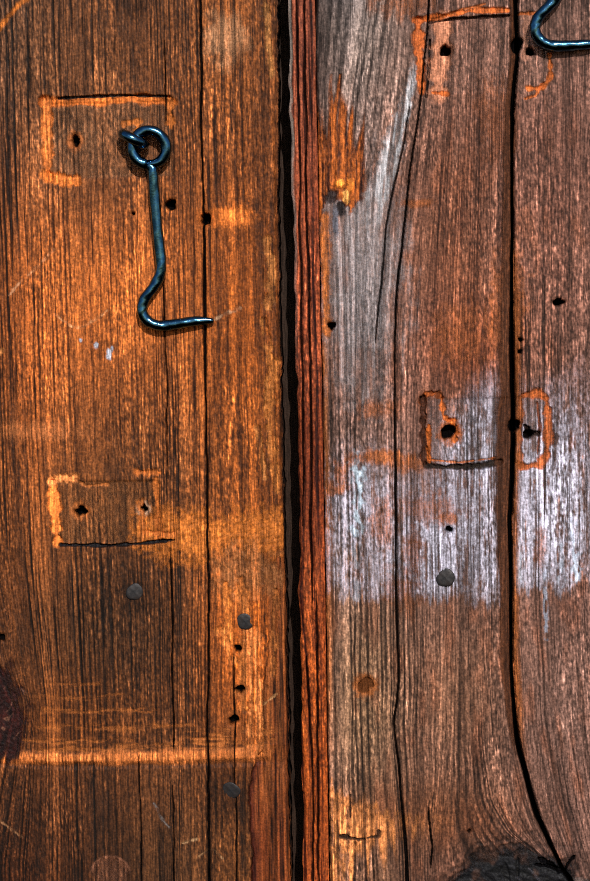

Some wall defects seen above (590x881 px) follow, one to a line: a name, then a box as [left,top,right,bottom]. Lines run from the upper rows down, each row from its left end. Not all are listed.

crack [375,0,430,881]
crack [426,807,434,868]
crack [495,0,575,881]